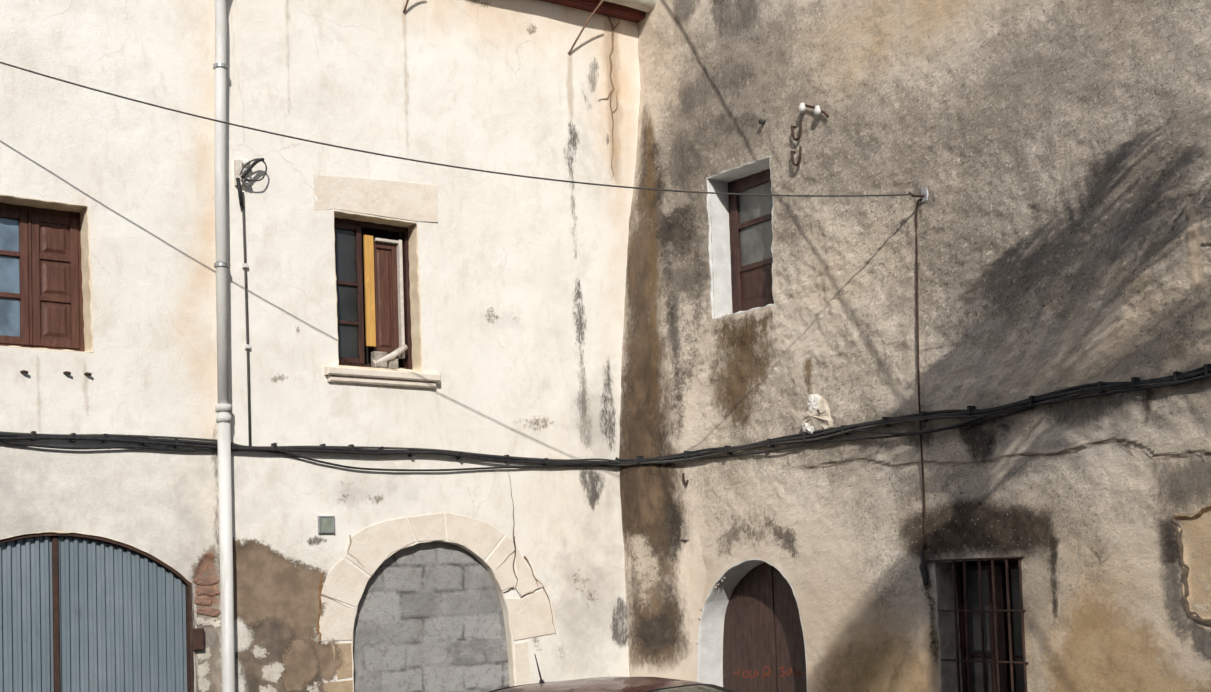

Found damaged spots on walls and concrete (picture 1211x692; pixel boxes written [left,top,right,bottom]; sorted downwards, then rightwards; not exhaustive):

water stain [674,0,757,36]
water stain [564,123,579,213]
crack [600,17,619,177]
water stain [574,280,587,343]
water stain [577,60,772,664]
flaking render [192,538,343,692]
crack [502,473,556,633]
water stain [718,507,797,557]
crack [823,438,1210,475]
water stain [900,499,1211,692]
water stain [1156,461,1211,659]
flaking render [1171,504,1211,625]